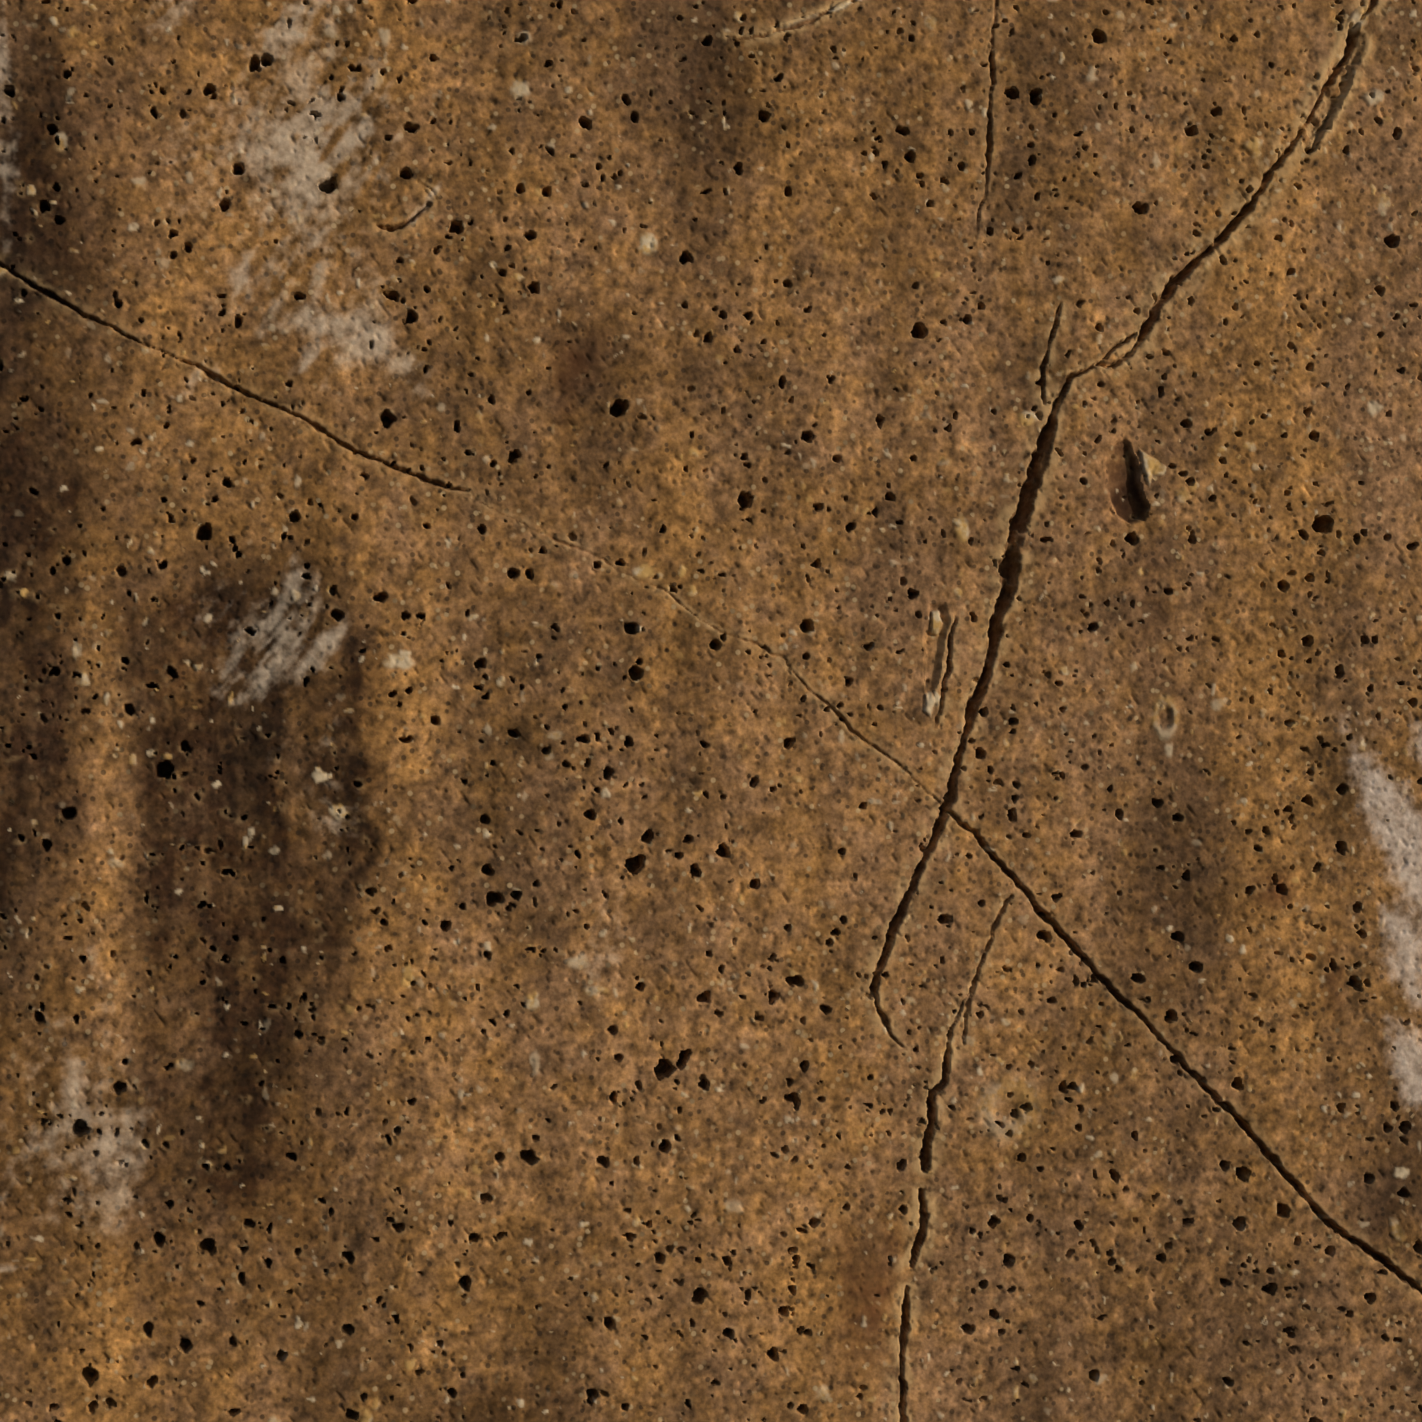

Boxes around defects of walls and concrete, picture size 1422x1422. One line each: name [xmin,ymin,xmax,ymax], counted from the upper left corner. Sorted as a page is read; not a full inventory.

crack [372,178,440,236]
crack [723,0,867,43]
damp [0,0,638,1422]
crack [0,254,941,806]
crack [865,0,1422,1301]
crack [895,1281,913,1422]